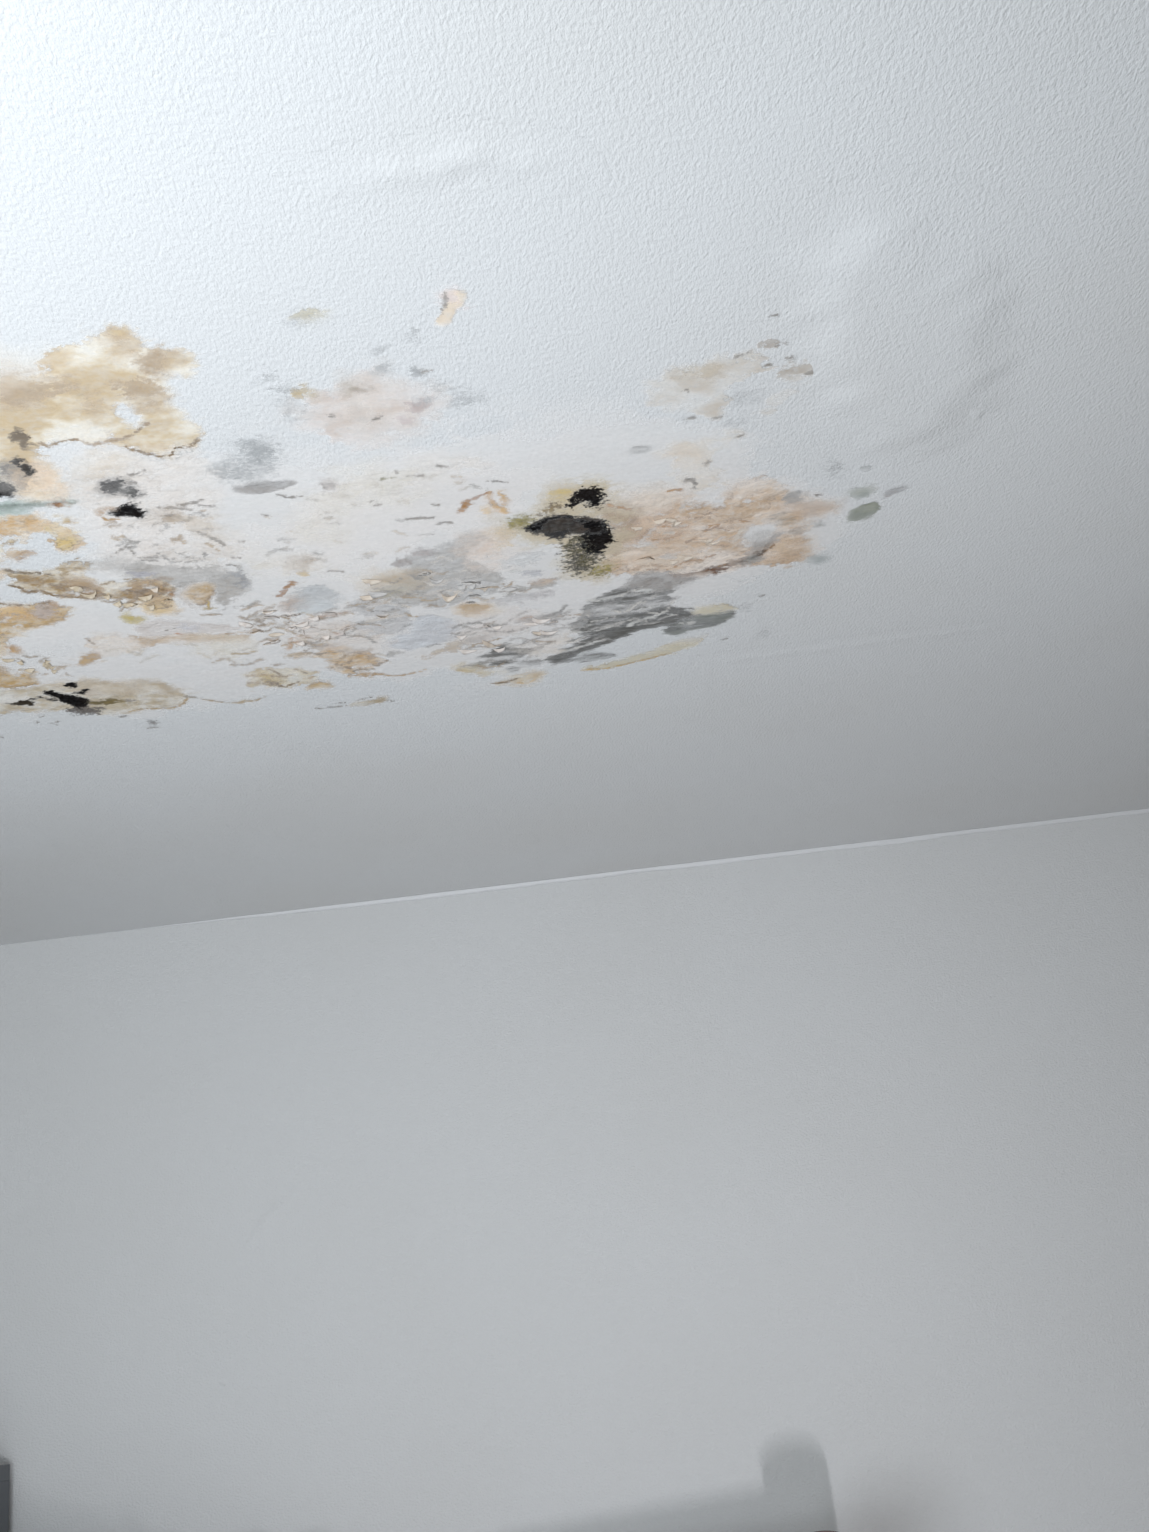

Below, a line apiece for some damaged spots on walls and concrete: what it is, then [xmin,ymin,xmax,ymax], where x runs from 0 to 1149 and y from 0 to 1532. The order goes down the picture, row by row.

peeling [436,290,467,325]
damp [0,324,905,729]
peeling [69,579,397,667]